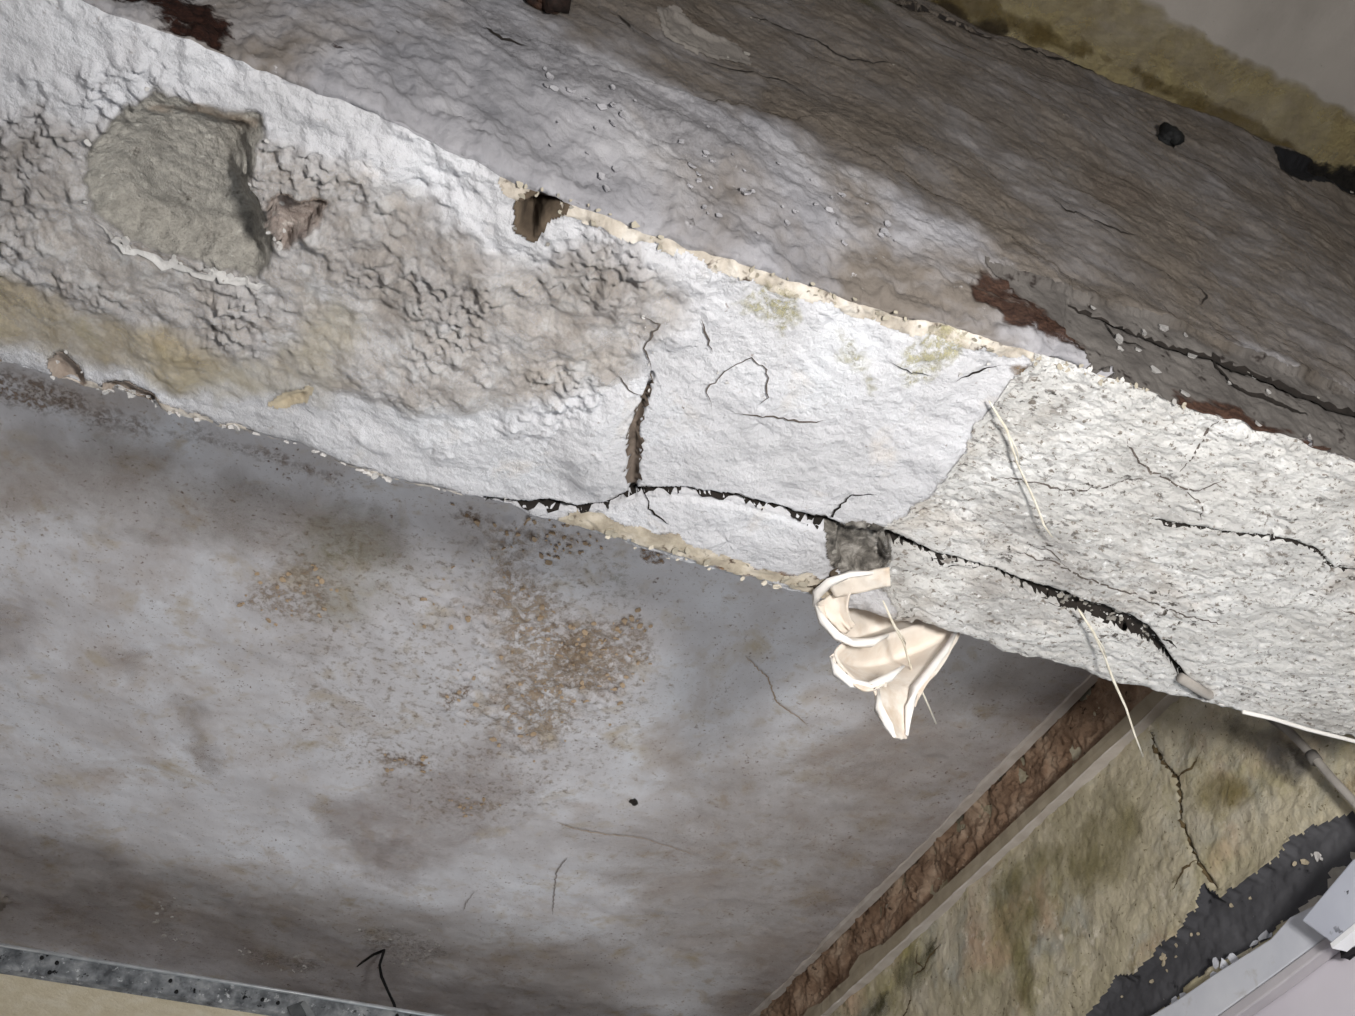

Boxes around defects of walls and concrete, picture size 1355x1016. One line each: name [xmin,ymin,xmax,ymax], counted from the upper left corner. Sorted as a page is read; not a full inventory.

rust [115,0,235,52]
spalling [0,87,352,332]
damp [0,373,80,410]
crack [485,315,873,529]
crack [894,363,999,382]
crack [1066,302,1355,416]
spalling [311,0,1355,1016]
crack [1000,421,1351,572]
crack [884,530,1225,675]
crack [746,657,808,727]
crack [1150,732,1218,889]
damp [1258,737,1307,777]